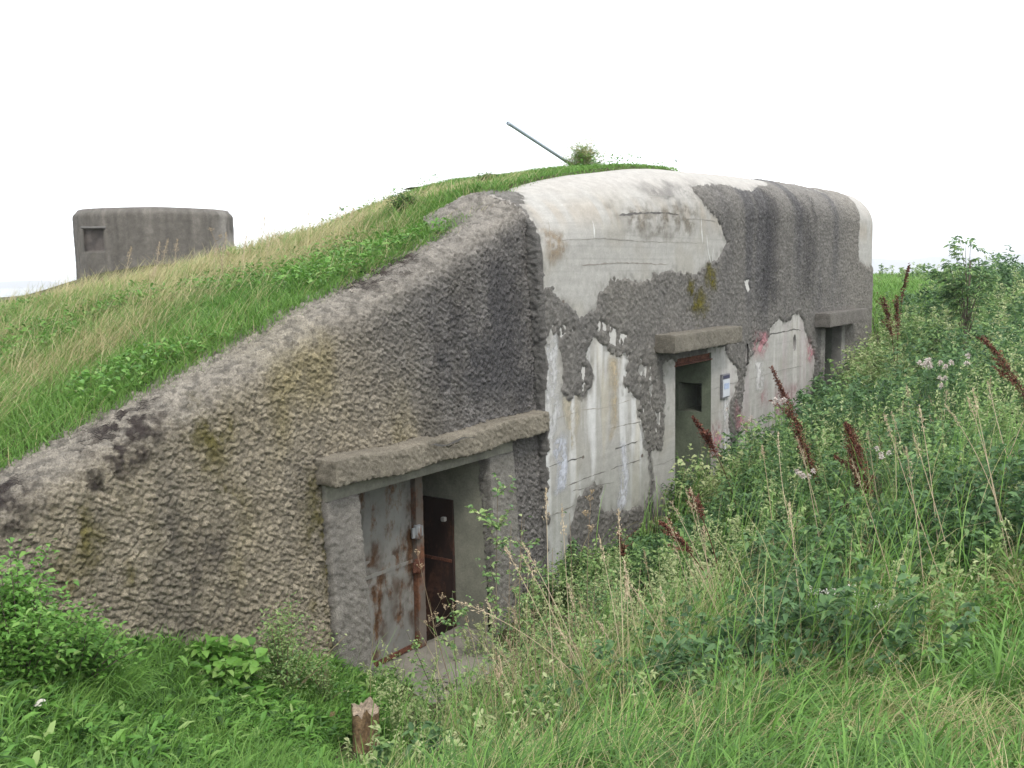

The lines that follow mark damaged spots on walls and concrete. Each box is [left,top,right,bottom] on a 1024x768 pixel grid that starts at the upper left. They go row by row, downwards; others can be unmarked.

peeling [508,169,767,594]
peeling [707,314,815,487]
rust [366,545,383,603]
rust [392,529,413,565]